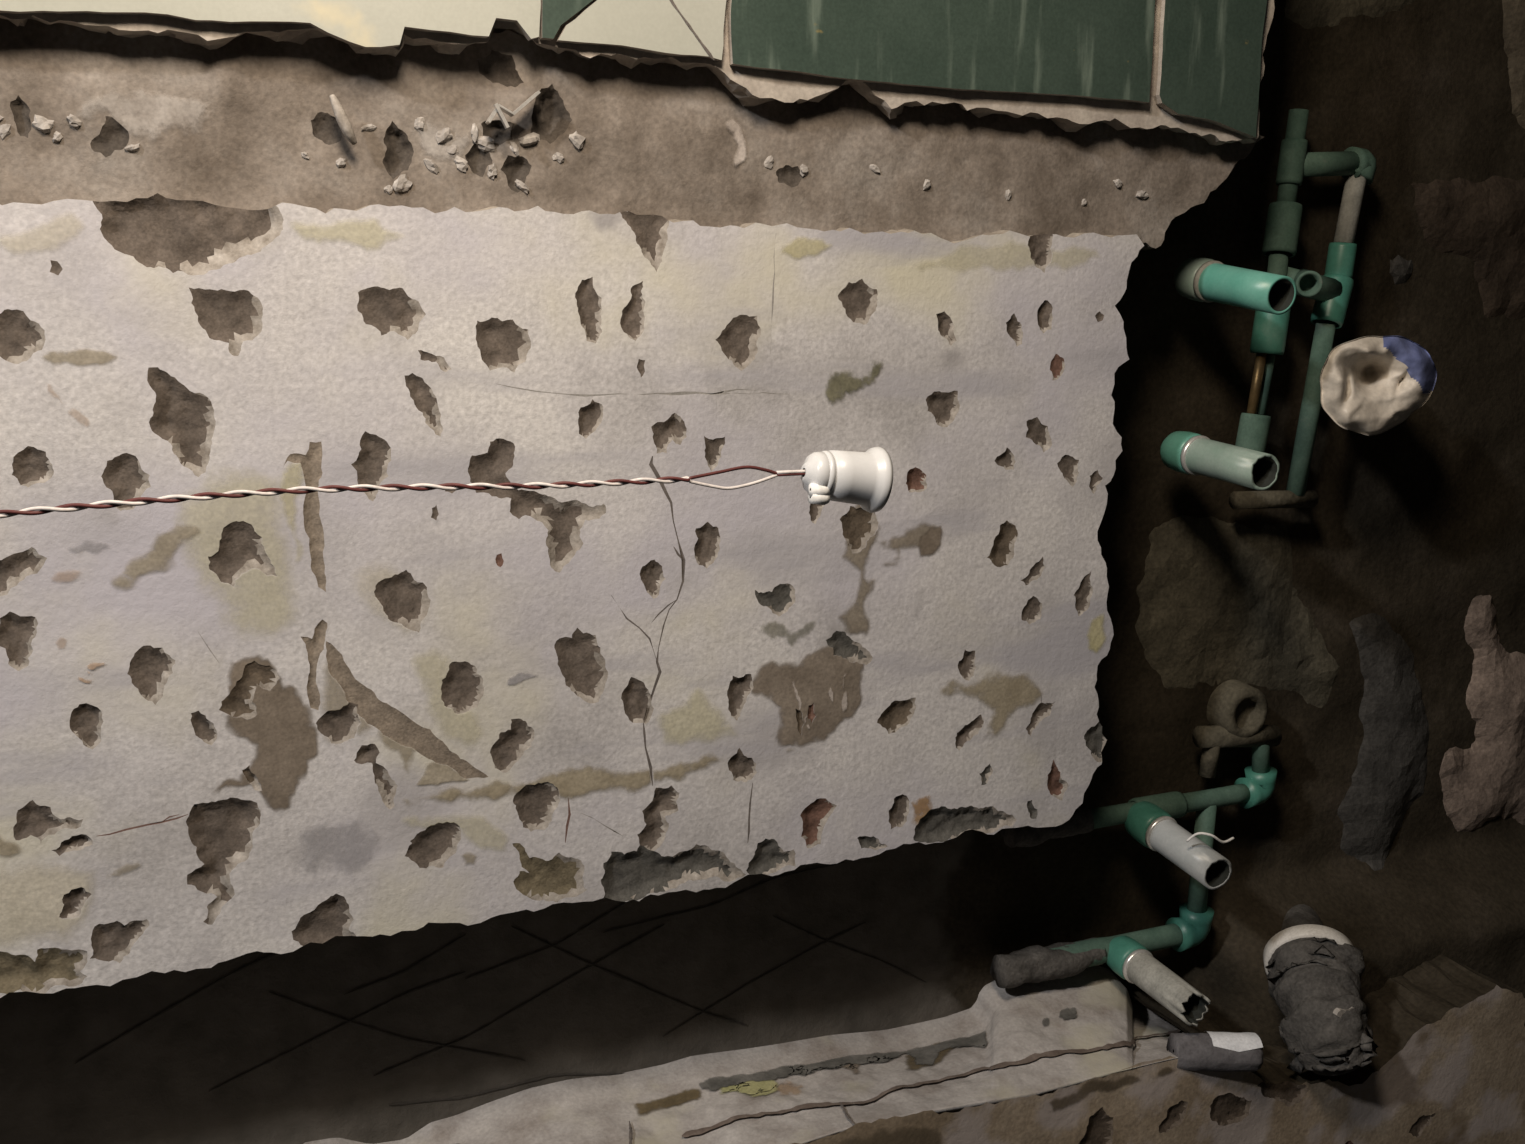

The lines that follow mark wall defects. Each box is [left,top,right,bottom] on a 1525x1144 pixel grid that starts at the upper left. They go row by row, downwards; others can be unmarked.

spalling [383,121,414,179]
spalling [465,84,572,192]
spalling [93,193,283,356]
spalling [147,367,216,477]
spalling [431,438,606,573]
crack [611,456,685,786]
peeling [727,631,873,746]
peeling [186,656,397,925]
spalling [512,782,837,902]
spalling [858,794,1037,850]
spalling [0,919,149,994]
crack [840,1102,854,1124]